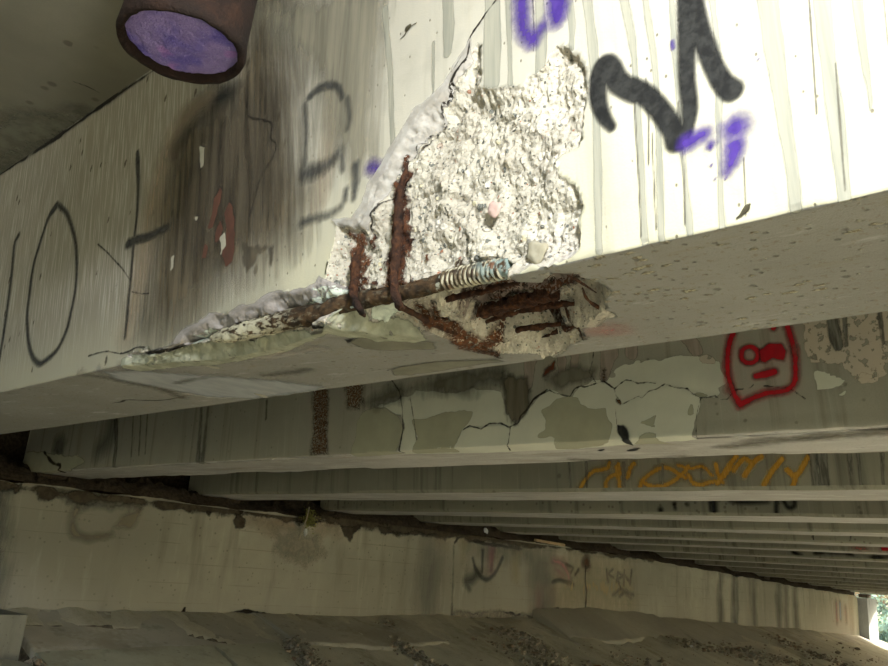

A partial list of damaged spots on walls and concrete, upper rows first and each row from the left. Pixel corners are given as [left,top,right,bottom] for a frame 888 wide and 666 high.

crack [406,0,496,163]
spalling [121,37,618,389]
rust [348,155,419,291]
crack [370,184,412,232]
rust [310,389,329,455]
water stain [308,285,349,305]
water stain [371,303,403,322]
crack [391,380,417,453]
rust [415,273,599,358]
crack [463,352,772,451]
peeling [600,346,638,381]
peeling [803,311,888,396]